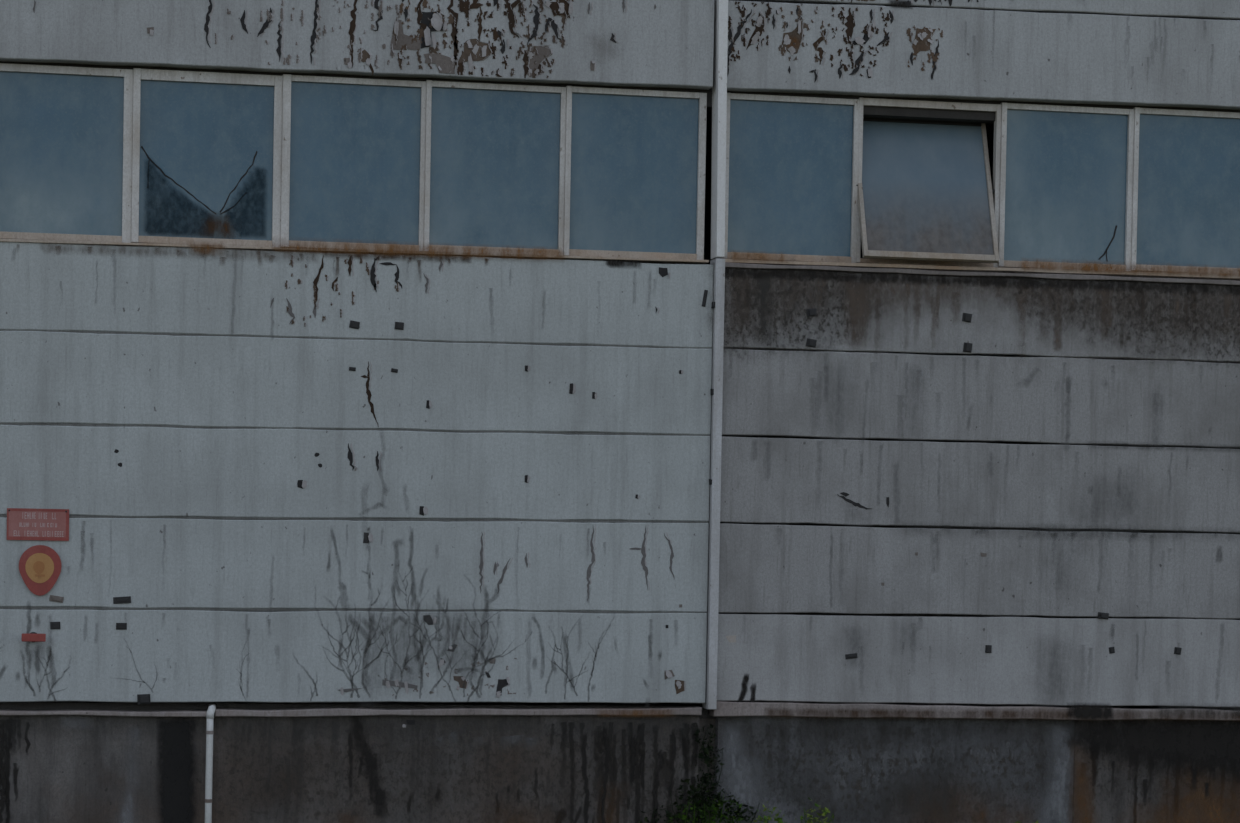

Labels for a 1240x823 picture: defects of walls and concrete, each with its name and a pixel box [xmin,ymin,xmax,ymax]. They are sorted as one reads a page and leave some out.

peeling [260,0,575,78]
peeling [728,0,952,78]
peeling [285,255,356,327]
leakage [725,267,1240,355]
leakage [0,719,30,823]